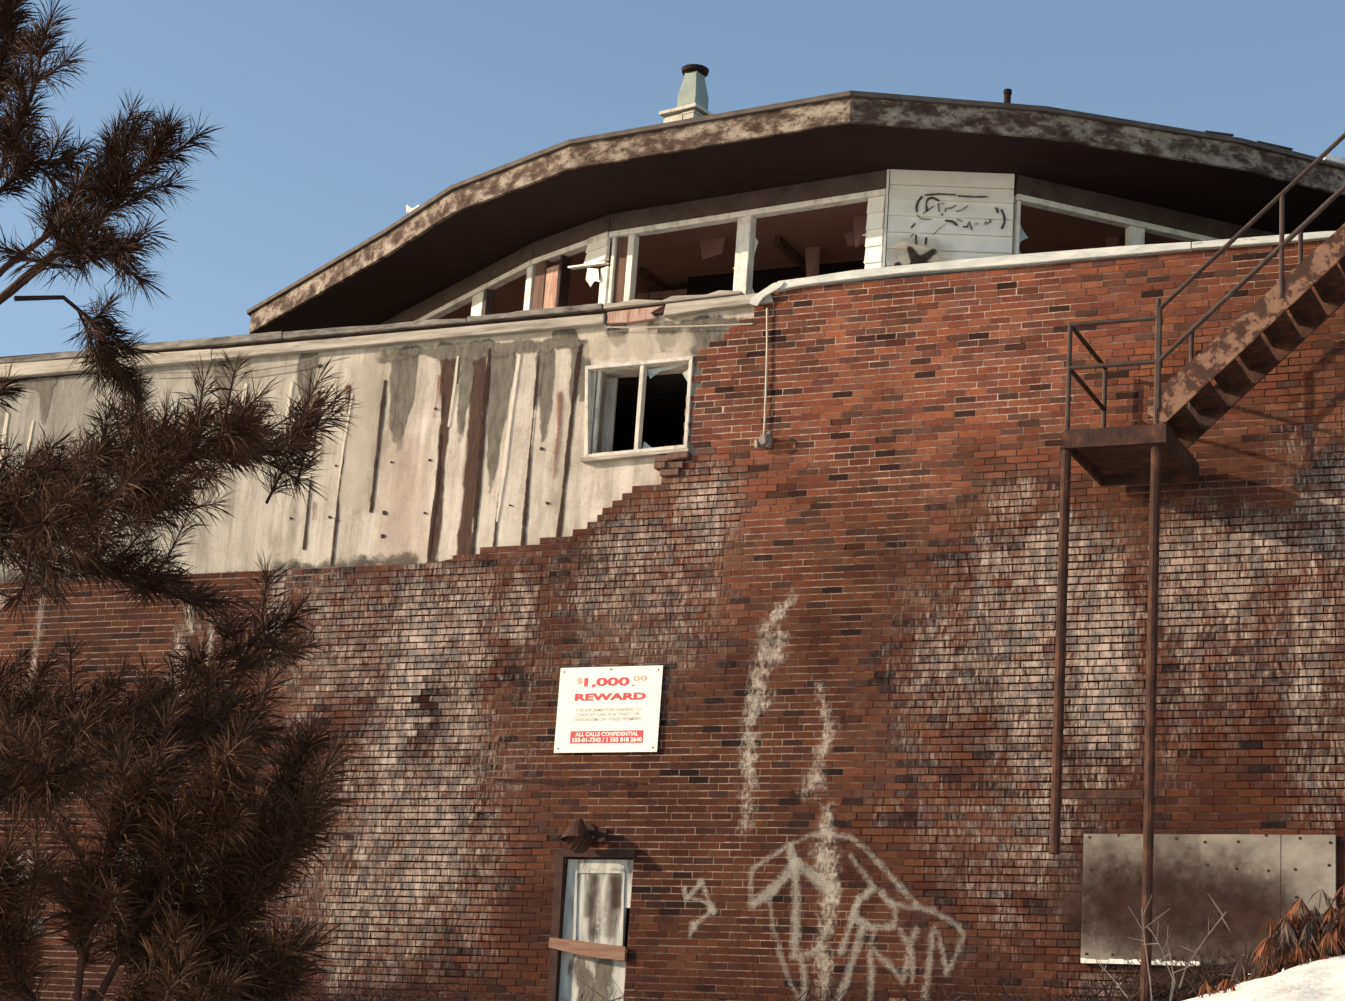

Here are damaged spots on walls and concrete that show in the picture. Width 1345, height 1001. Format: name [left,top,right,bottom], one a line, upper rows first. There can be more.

leakage [15,377,58,424]
leakage [266,329,591,989]
efflorescence [571,469,741,648]
efflorescence [742,602,791,798]
efflorescence [916,512,1138,867]
efflorescence [1148,458,1345,714]